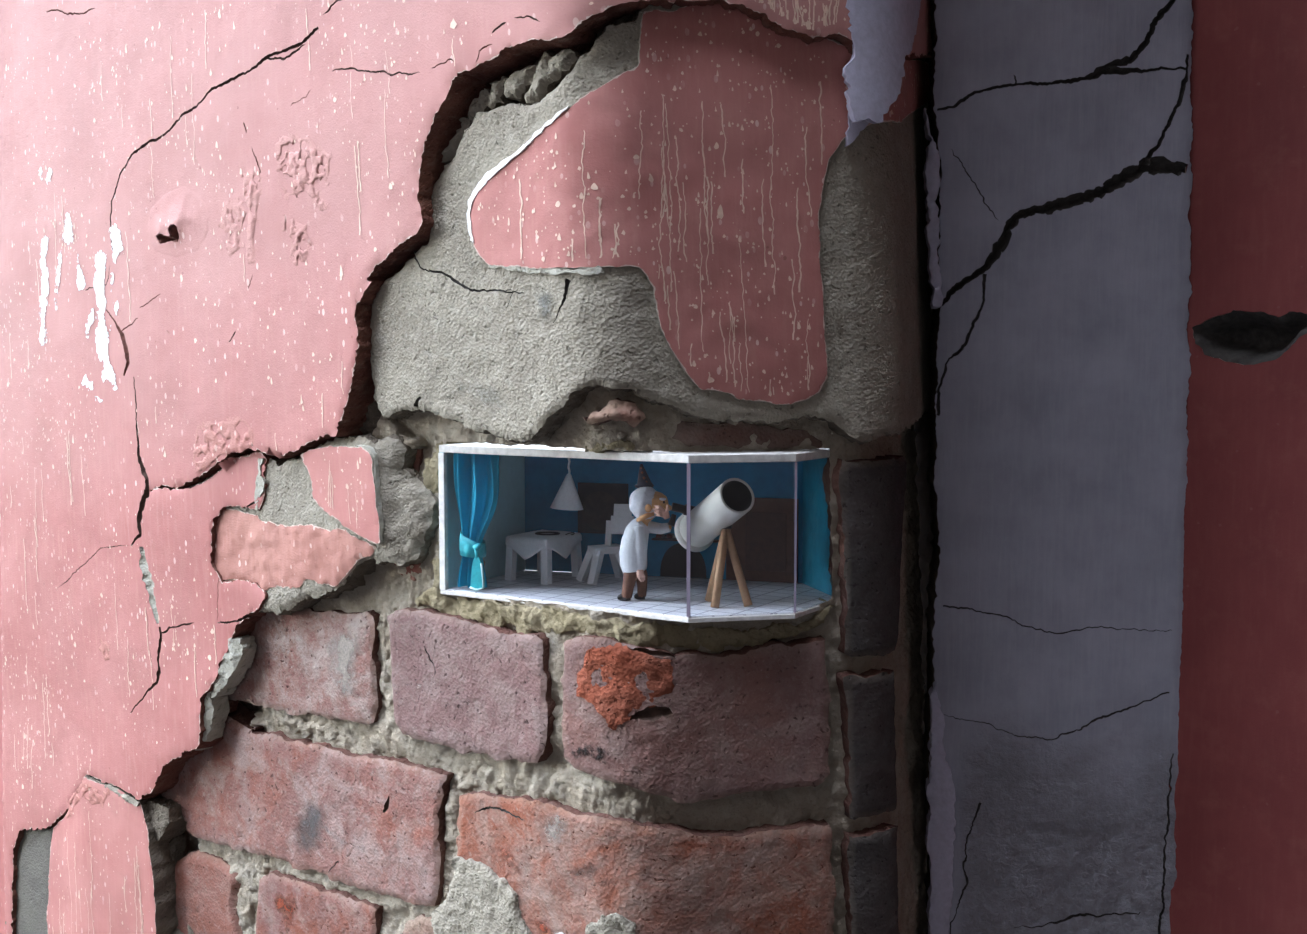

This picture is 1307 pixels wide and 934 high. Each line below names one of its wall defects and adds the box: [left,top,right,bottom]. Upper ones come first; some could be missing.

crack [58,0,341,713]
flaking render [189,4,932,615]
crack [936,0,1189,416]
peeling [196,635,257,750]
spalling [576,643,675,730]
spalling [275,894,296,920]